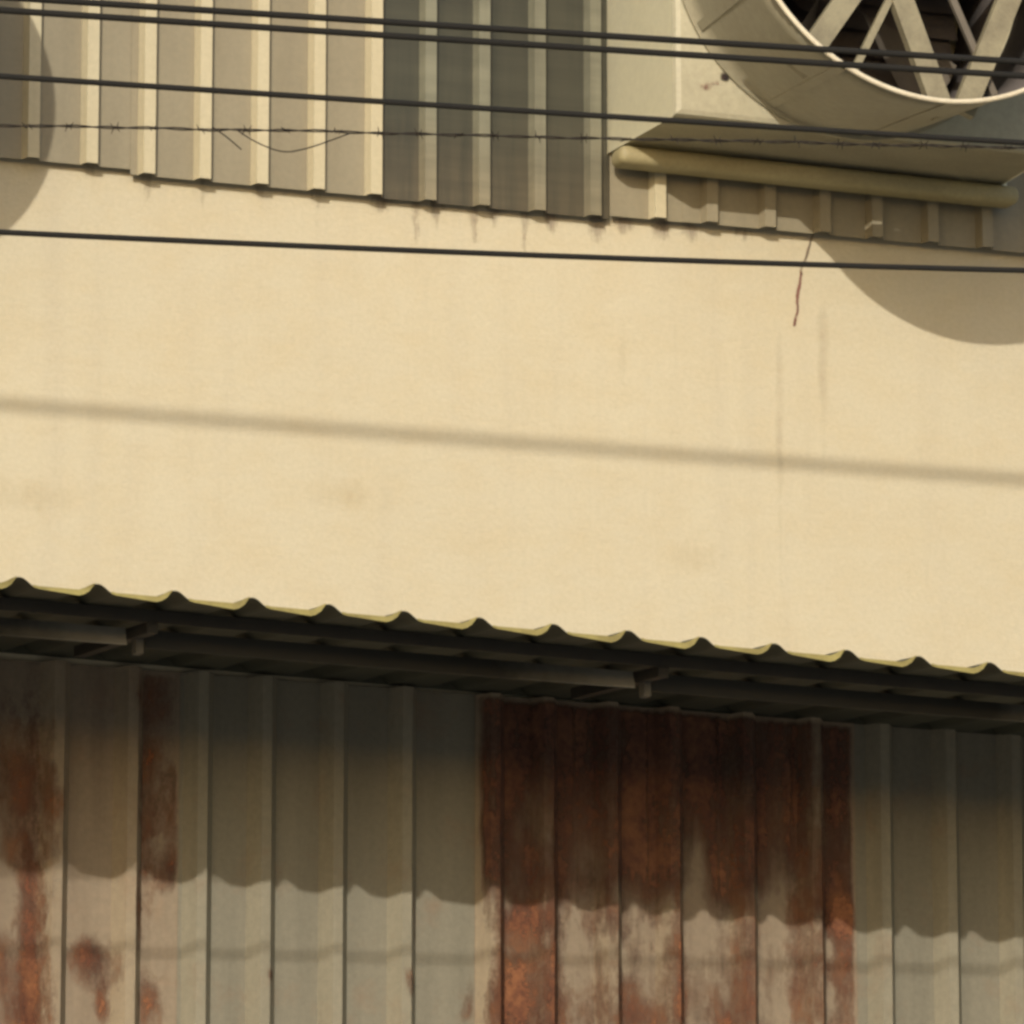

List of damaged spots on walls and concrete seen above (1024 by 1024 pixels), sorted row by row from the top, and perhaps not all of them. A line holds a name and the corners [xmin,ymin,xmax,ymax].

corrosion [793,235,813,326]
corrosion [0,751,63,1024]
corrosion [71,940,106,1018]
corrosion [480,698,854,1024]